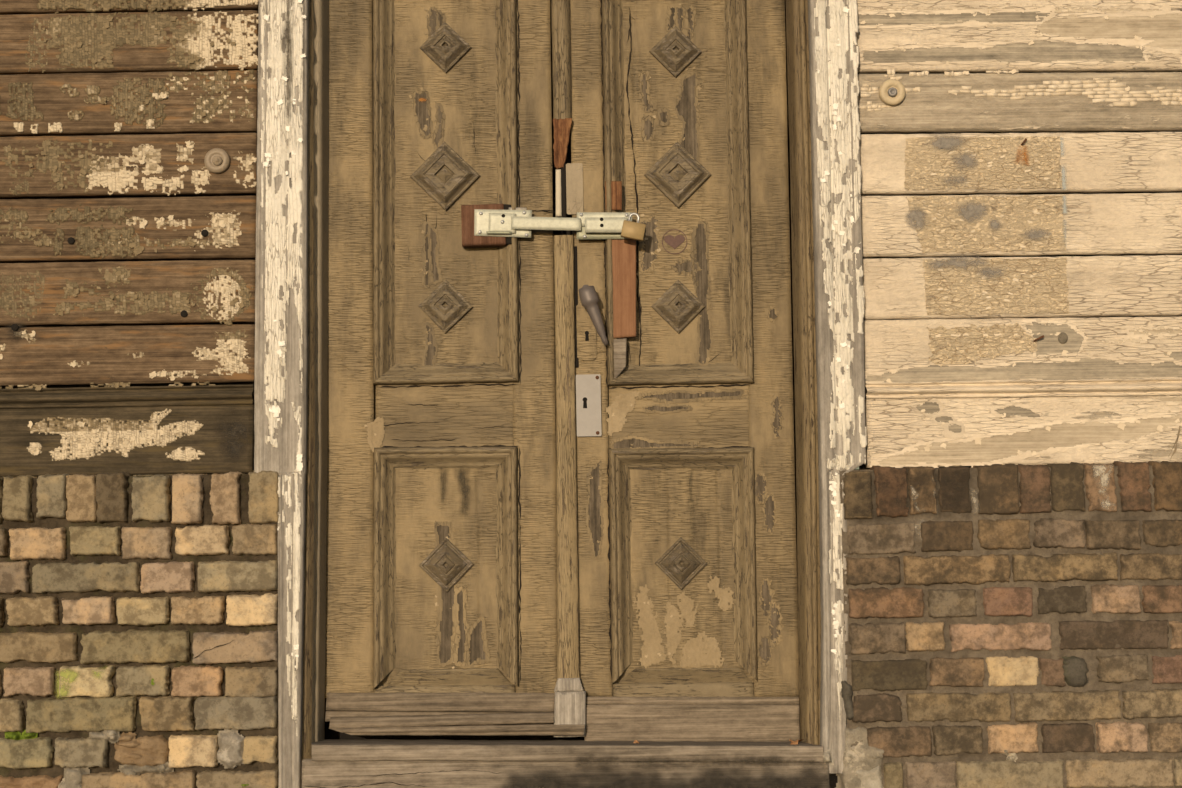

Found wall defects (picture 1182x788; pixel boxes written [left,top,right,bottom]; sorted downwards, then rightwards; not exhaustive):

water stain [960,204,1000,229]
peeling [0,0,307,736]
peeling [814,0,1182,722]
peeling [632,584,725,668]
peeling [707,575,736,611]